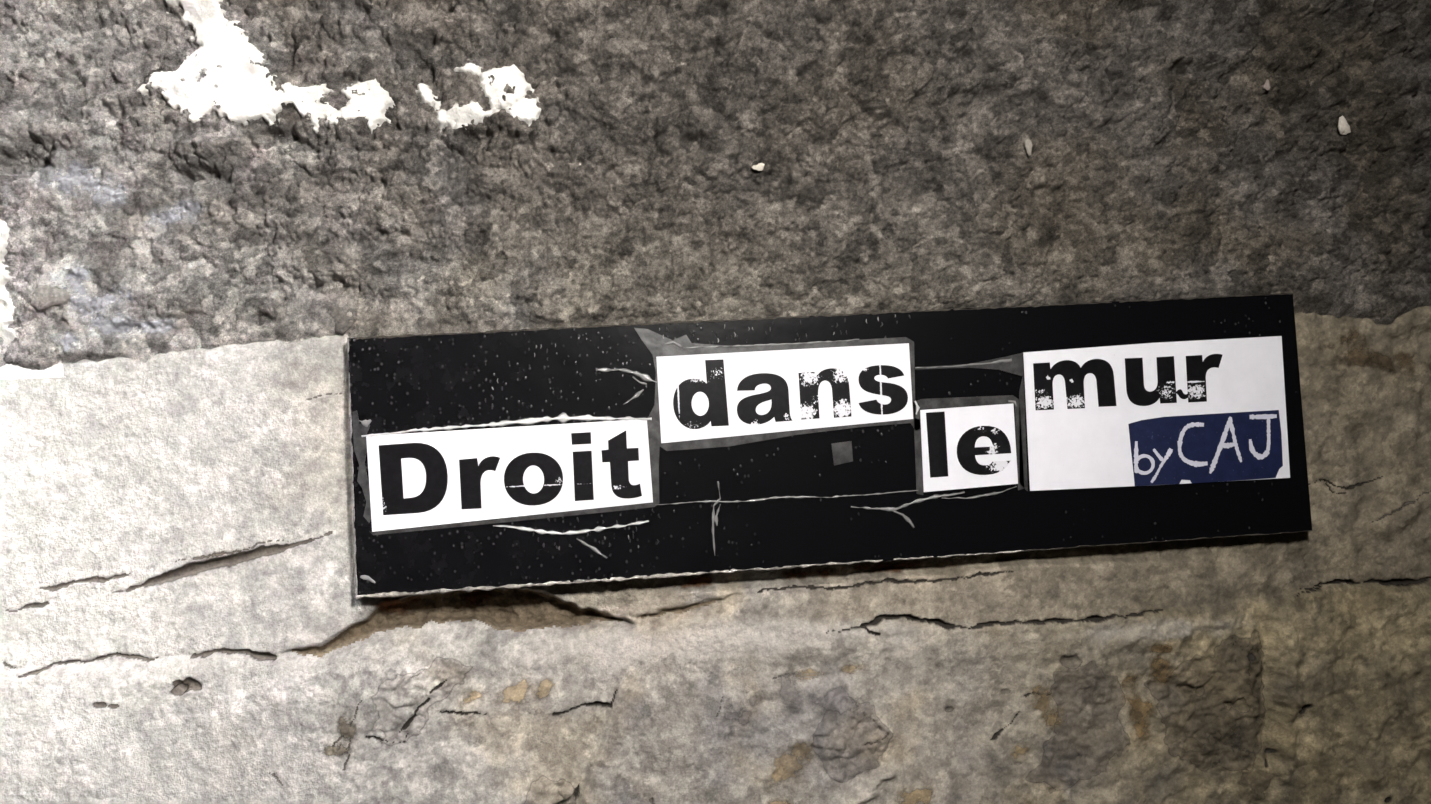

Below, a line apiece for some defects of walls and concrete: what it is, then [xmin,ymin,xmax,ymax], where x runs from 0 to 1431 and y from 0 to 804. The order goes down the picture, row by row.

peeling [137,0,399,136]
peeling [416,63,541,131]
spalling [1338,115,1351,135]
peeling [0,219,71,344]
spalling [330,306,357,335]
peeling [0,361,64,380]
crack [6,531,333,612]
crack [757,571,1163,636]
crack [1297,577,1431,596]
crack [3,647,277,678]
crack [332,673,487,770]
crack [552,690,617,716]